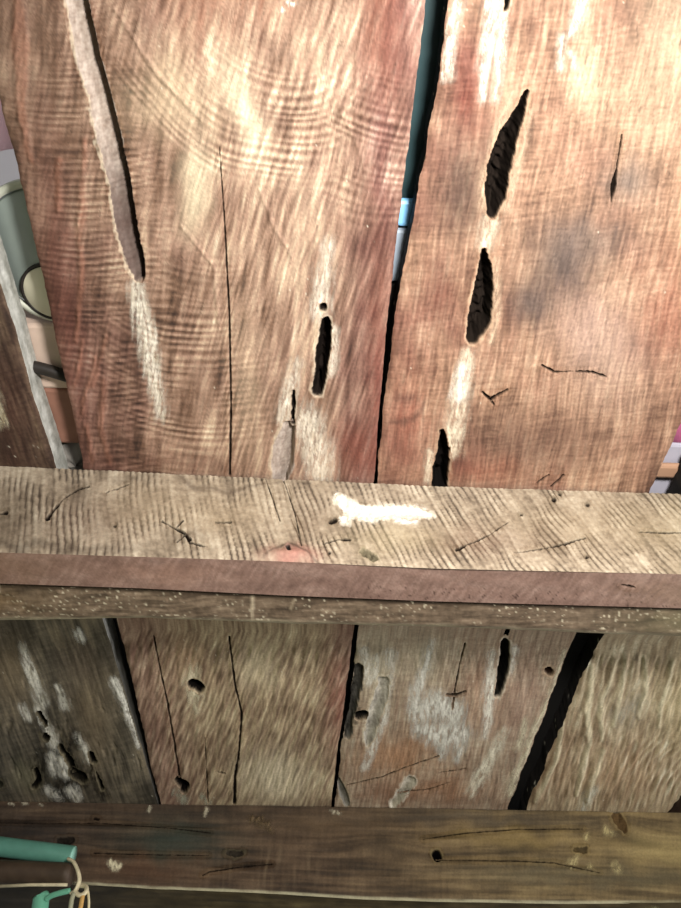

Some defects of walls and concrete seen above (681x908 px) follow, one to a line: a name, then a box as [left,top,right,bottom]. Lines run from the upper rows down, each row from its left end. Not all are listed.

leakage [441,0,458,79]
leakage [480,0,507,100]
crack [215,141,237,477]
crack [537,360,612,383]
crack [261,478,356,549]
crack [451,518,591,557]
leakage [19,644,79,803]
leakage [111,678,140,746]
crack [149,631,247,805]
leakage [409,641,469,761]
leakage [484,651,495,738]
crack [0,813,276,879]